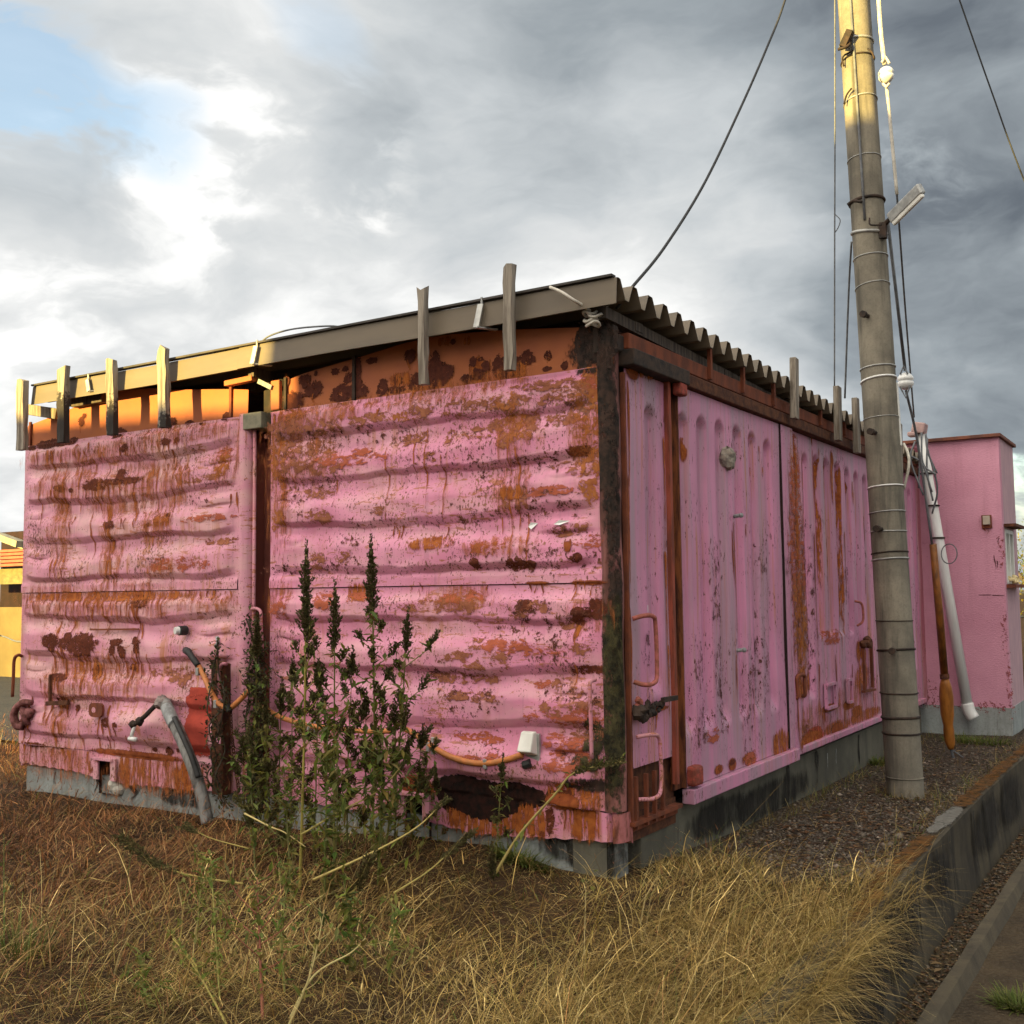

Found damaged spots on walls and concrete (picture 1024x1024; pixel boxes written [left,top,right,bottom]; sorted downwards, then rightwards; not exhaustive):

rust [273,337,568,504]
rust [498,428,530,566]
rust [16,411,247,794]
peeling [261,366,623,822]
rust [515,581,549,596]
rust [573,619,581,685]
rust [571,580,606,600]
water stain [605,442,623,710]
peeling [688,636,730,756]
peeling [739,626,770,752]
rust [773,432,880,755]
rust [442,780,615,844]